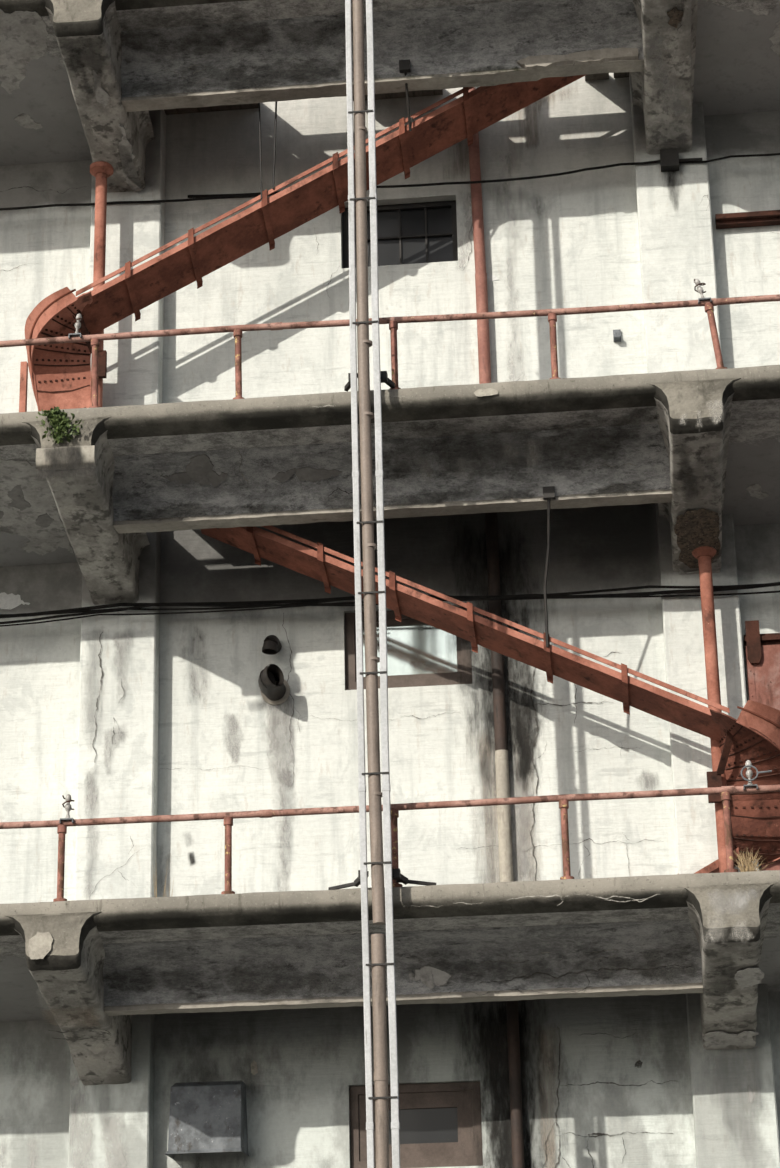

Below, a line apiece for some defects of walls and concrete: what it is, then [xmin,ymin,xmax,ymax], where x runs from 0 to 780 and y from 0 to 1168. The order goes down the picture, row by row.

peeling [0,9,48,94]
spalling [674,509,721,575]
peeling [0,592,30,610]
crack [92,632,124,759]
spalling [717,959,764,999]
spalling [703,1031,759,1049]
water stain [482,1011,531,1168]
crack [543,1033,673,1168]